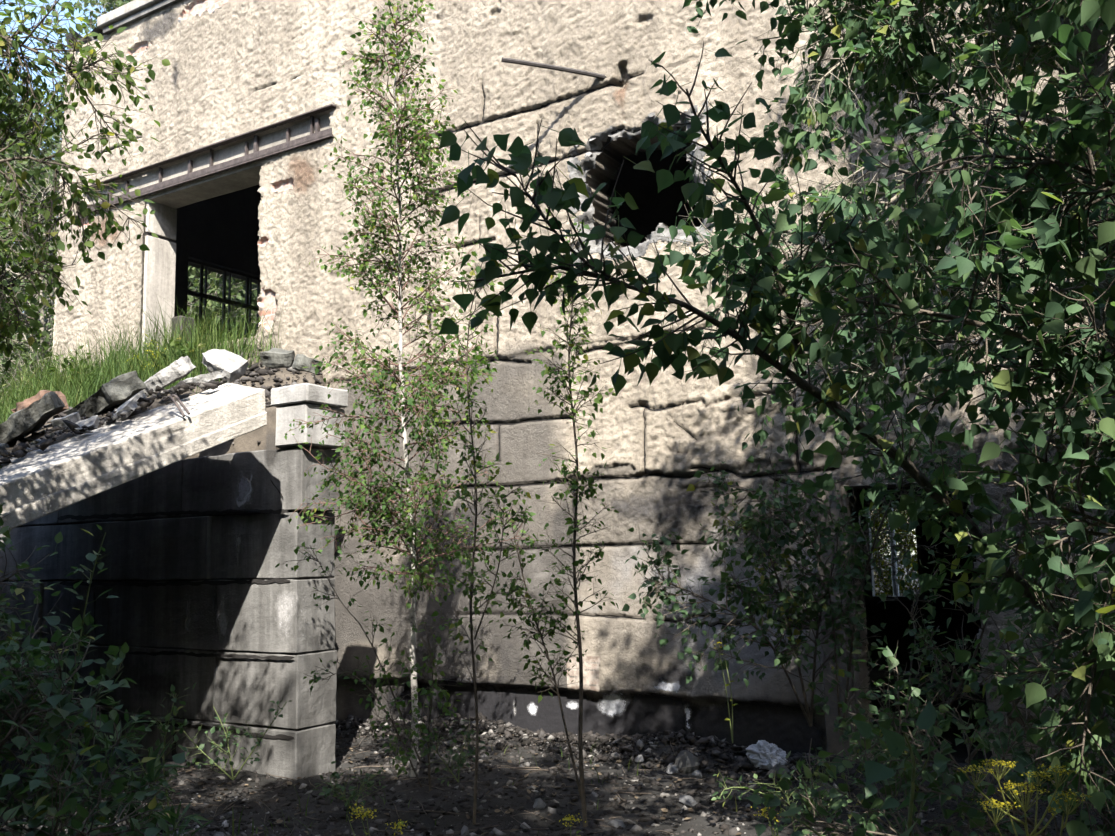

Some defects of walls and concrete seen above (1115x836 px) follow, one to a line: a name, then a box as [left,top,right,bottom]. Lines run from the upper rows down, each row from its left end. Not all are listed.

flaking render [178,0,230,23]
spalling [567,99,713,263]
flaking render [257,287,278,332]